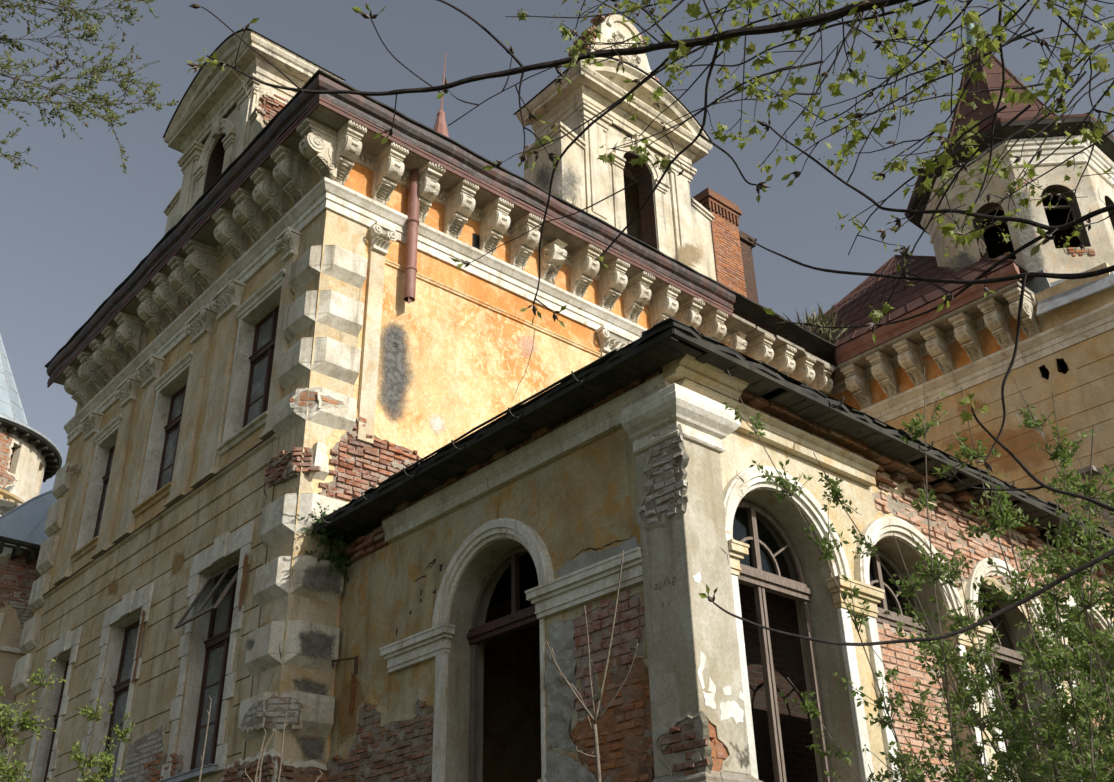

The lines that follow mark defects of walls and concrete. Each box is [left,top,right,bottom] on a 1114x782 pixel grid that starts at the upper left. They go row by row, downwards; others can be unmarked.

leakage [379,324,411,420]
spalling [0,427,19,488]
spalling [0,548,42,634]
spalling [264,388,427,503]
spalling [557,424,689,577]
spalling [867,485,1114,630]
spalling [220,688,434,782]
spalling [544,588,745,782]
flaking render [876,620,956,782]